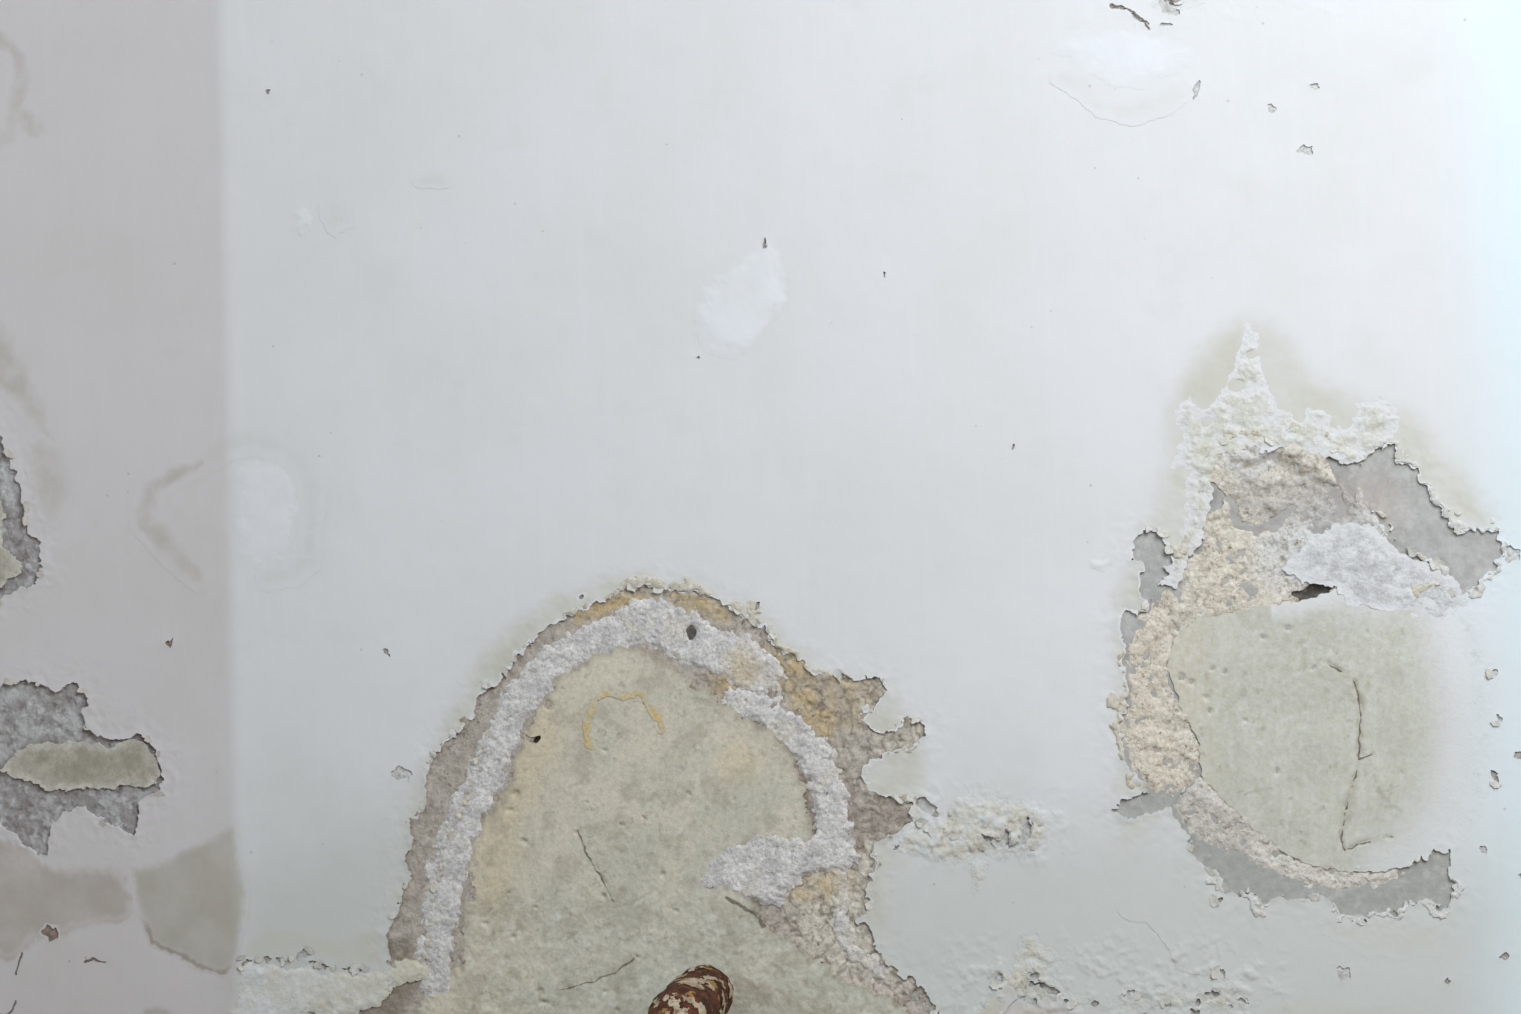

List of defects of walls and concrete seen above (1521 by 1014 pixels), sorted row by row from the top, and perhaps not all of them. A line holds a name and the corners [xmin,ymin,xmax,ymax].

peeling [1109,0,1207,29]
peeling [1296,145,1313,155]
flaking render [0,436,44,606]
flaking render [1105,322,1521,926]
flaking render [0,678,166,855]
flaking render [228,576,1053,1014]
peeling [986,931,1263,1014]